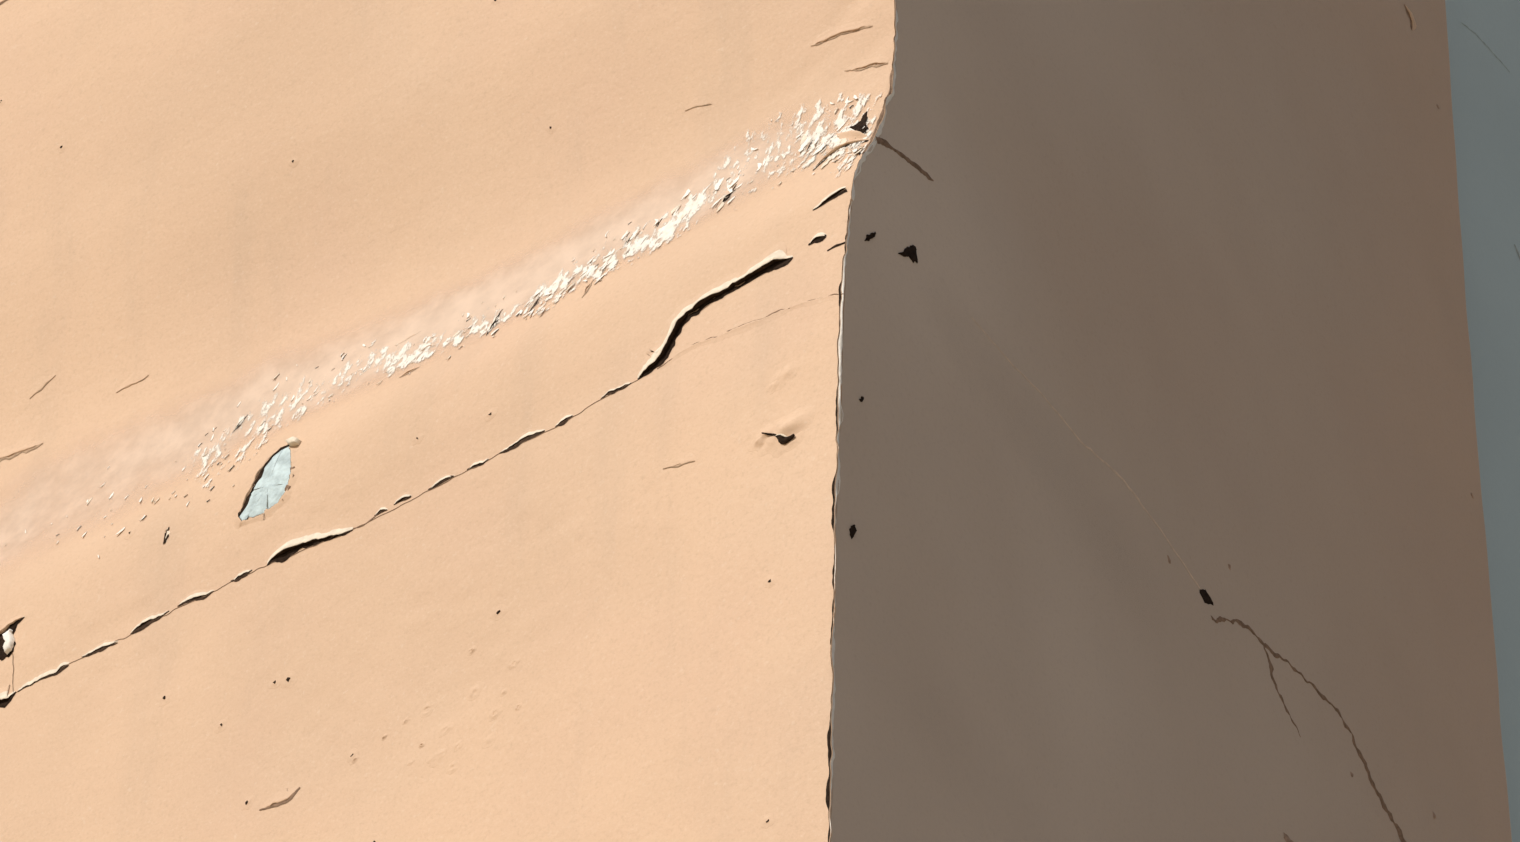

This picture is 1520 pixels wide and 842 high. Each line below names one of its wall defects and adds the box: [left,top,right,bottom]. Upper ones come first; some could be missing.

peeling [0,0,898,840]
crack [0,137,934,708]
crack [1200,589,1406,842]